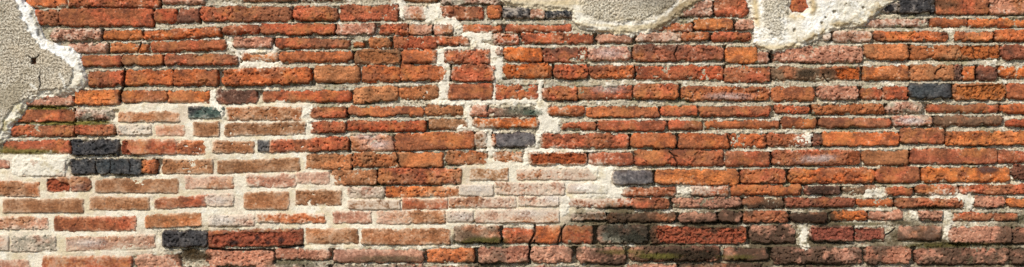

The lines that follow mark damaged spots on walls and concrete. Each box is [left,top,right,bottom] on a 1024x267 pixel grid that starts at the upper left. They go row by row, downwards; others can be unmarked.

flaking render [501,0,704,38]
flaking render [746,0,896,54]
flaking render [0,0,88,145]